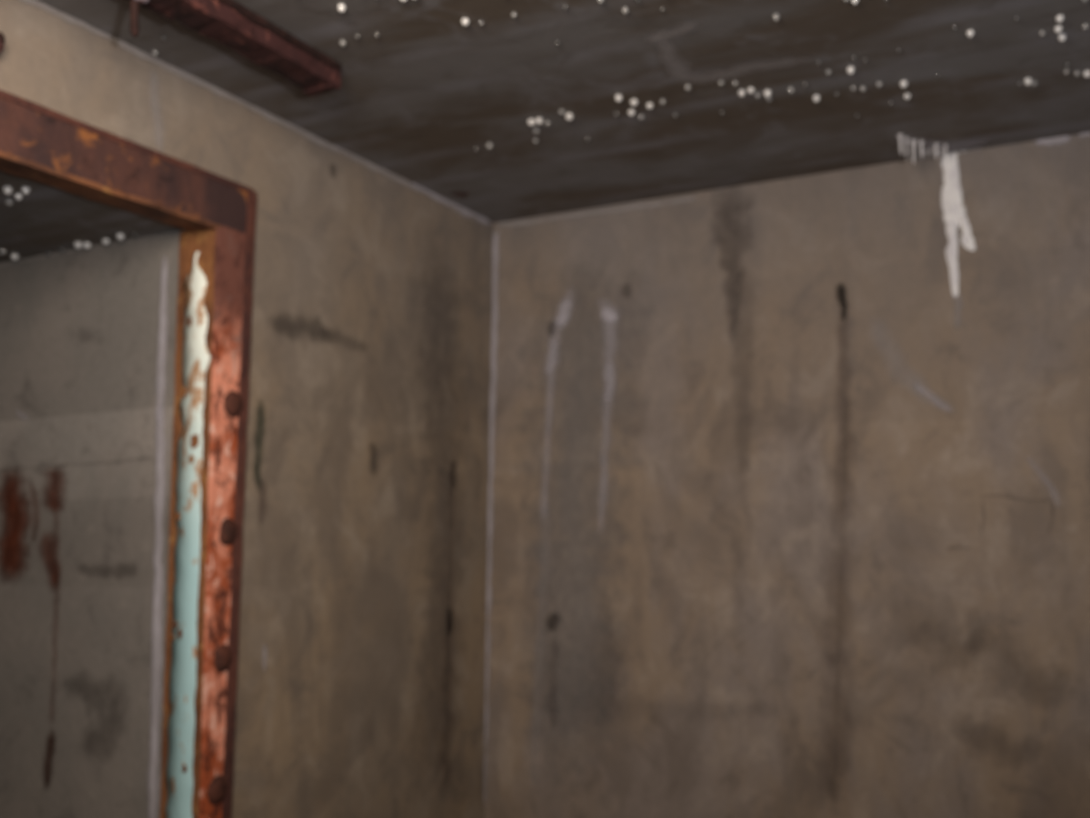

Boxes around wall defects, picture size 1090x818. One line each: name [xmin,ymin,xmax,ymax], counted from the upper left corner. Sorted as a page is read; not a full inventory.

rust [0,90,257,818]
damp [23,0,693,818]
damp [896,134,988,298]